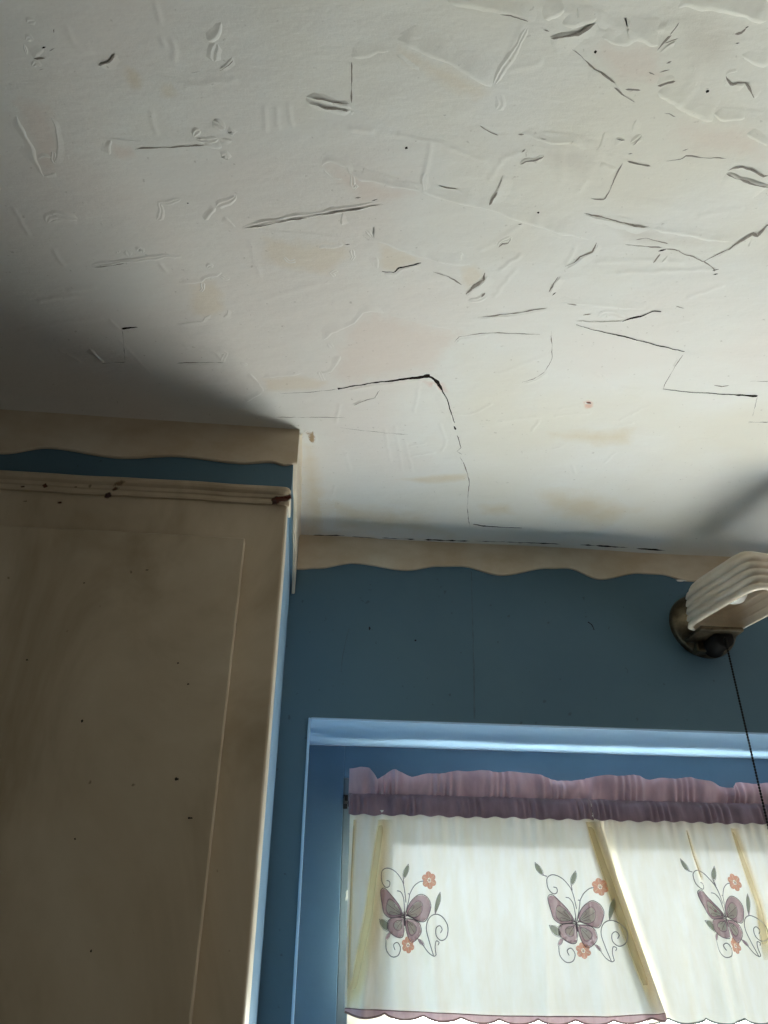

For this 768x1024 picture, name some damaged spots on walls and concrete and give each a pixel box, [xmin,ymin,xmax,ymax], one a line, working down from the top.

crack [250,204,382,228]
crack [456,295,768,423]
crack [285,374,555,544]
rust [271,494,292,505]
crack [586,543,663,551]